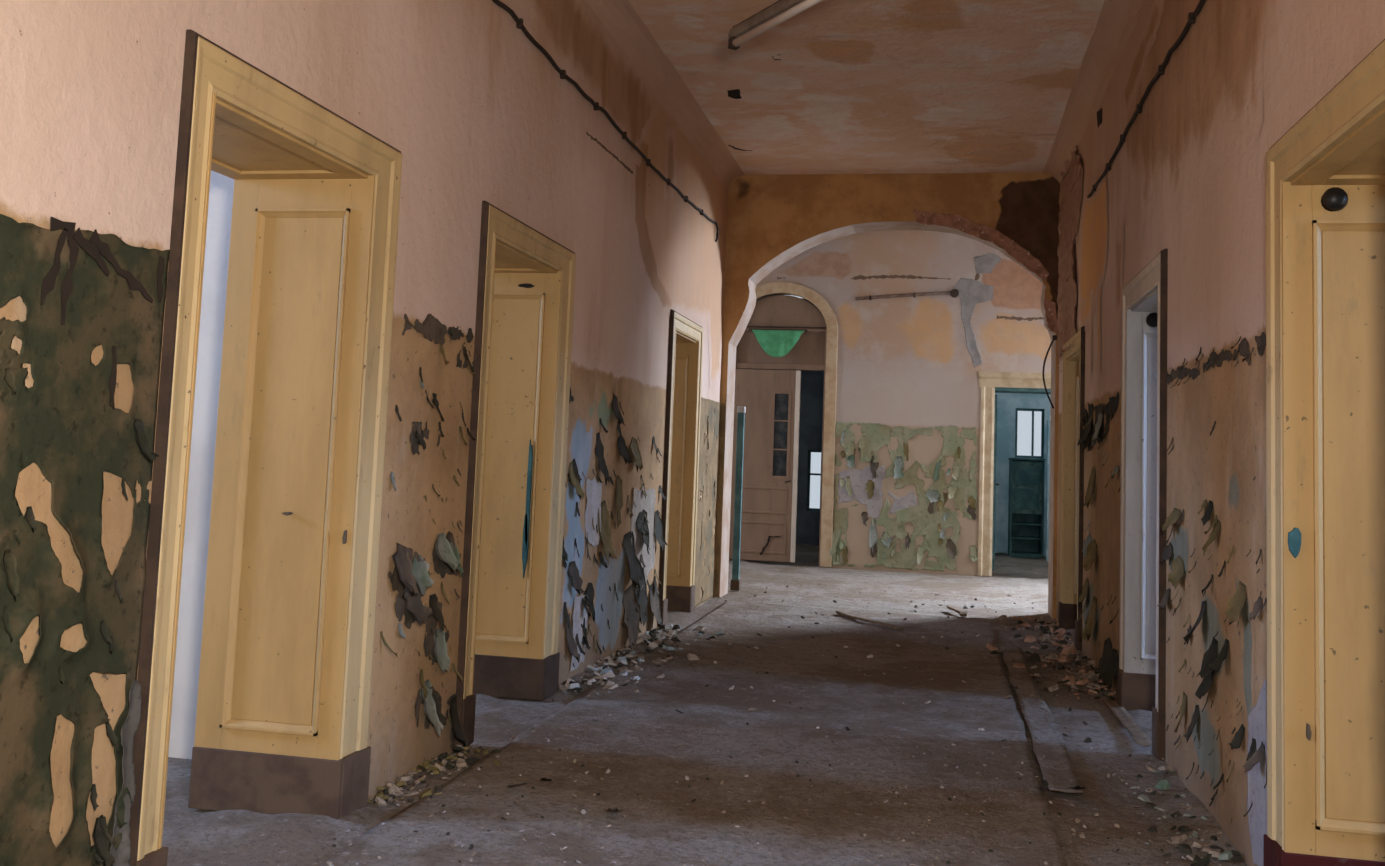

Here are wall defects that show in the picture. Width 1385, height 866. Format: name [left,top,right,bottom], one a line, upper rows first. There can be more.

peeling [0,214,170,866]
peeling [380,519,469,749]
peeling [395,367,476,486]
peeling [402,313,477,374]
peeling [558,382,668,672]
peeling [694,397,726,607]
damp [677,0,1093,376]
peeling [830,422,978,572]
spalling [913,145,1108,375]
damp [1114,0,1296,330]
peeling [1157,460,1267,866]
peeling [1166,332,1266,388]